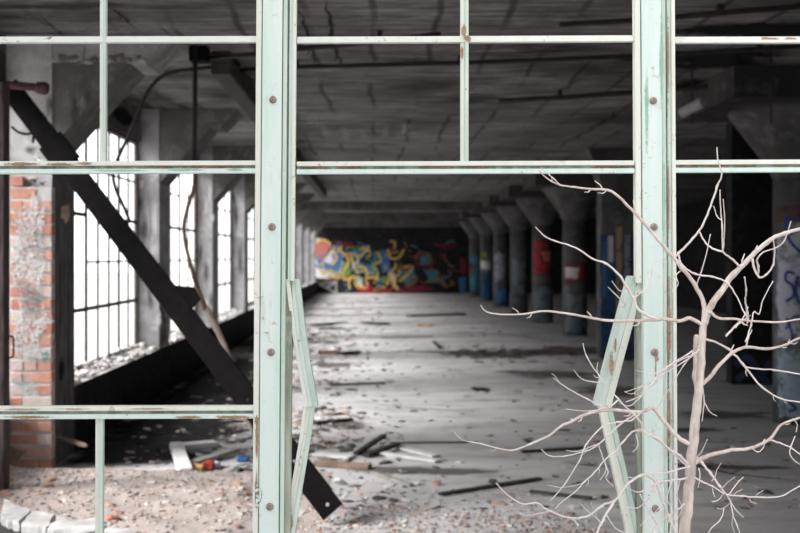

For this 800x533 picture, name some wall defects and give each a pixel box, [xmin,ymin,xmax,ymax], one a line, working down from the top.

crack [297,2,343,64]
peeling [11,177,52,362]
corrosion [655,276,671,376]
corrosion [217,415,259,457]